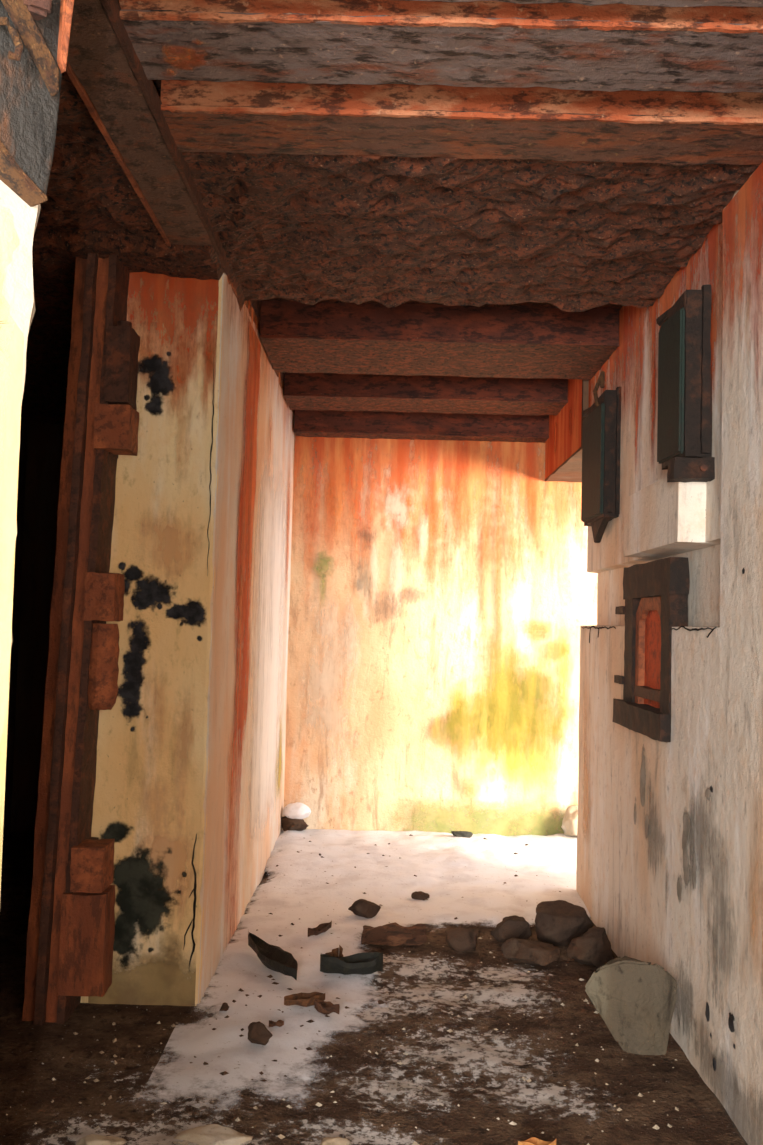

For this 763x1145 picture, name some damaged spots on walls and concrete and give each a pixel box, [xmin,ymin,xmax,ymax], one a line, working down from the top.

rust [229,300,271,804]
rust [287,162,763,637]